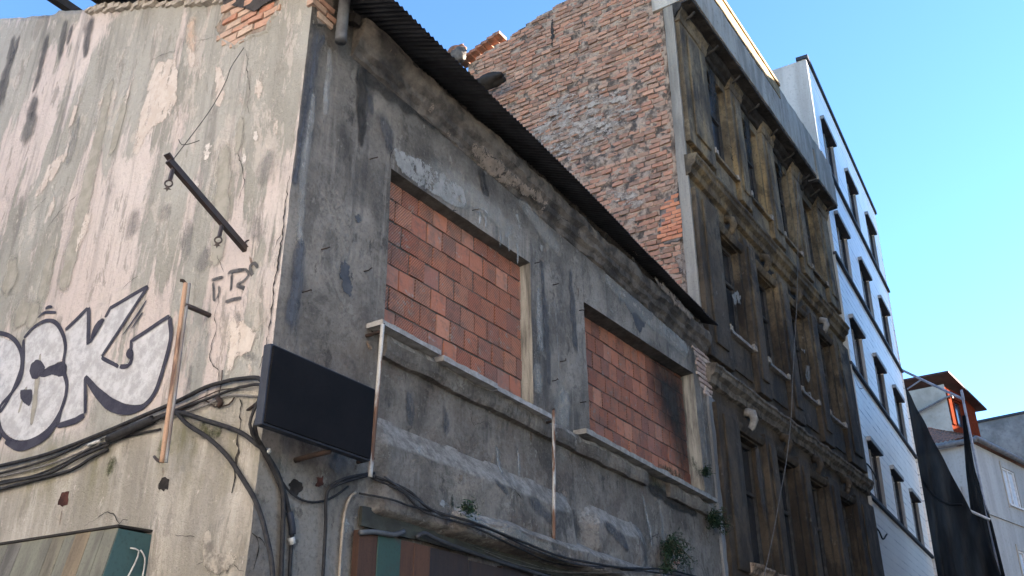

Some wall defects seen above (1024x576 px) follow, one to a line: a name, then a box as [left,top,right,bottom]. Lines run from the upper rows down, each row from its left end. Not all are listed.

spalling [214,0,283,49]
water stain [0,37,20,104]
water stain [23,19,93,141]
peeling [132,50,199,154]
peeling [213,66,225,107]
water stain [356,73,392,151]
spalling [469,142,548,210]
crack [259,177,290,368]
water stain [286,204,304,328]
crack [207,297,219,376]
peeling [227,318,256,373]
crack [231,398,242,493]